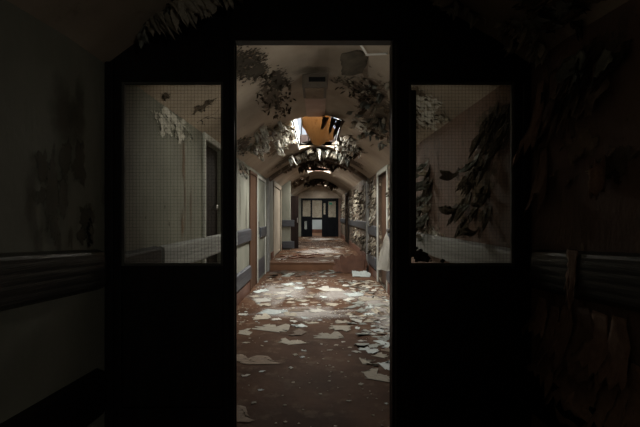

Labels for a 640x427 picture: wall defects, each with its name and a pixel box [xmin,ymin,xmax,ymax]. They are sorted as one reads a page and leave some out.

peeling [137,0,243,49]
peeling [150,92,193,144]
peeling [237,45,390,191]
peeling [411,86,451,135]
peeling [416,101,510,242]
peeling [340,179,377,257]